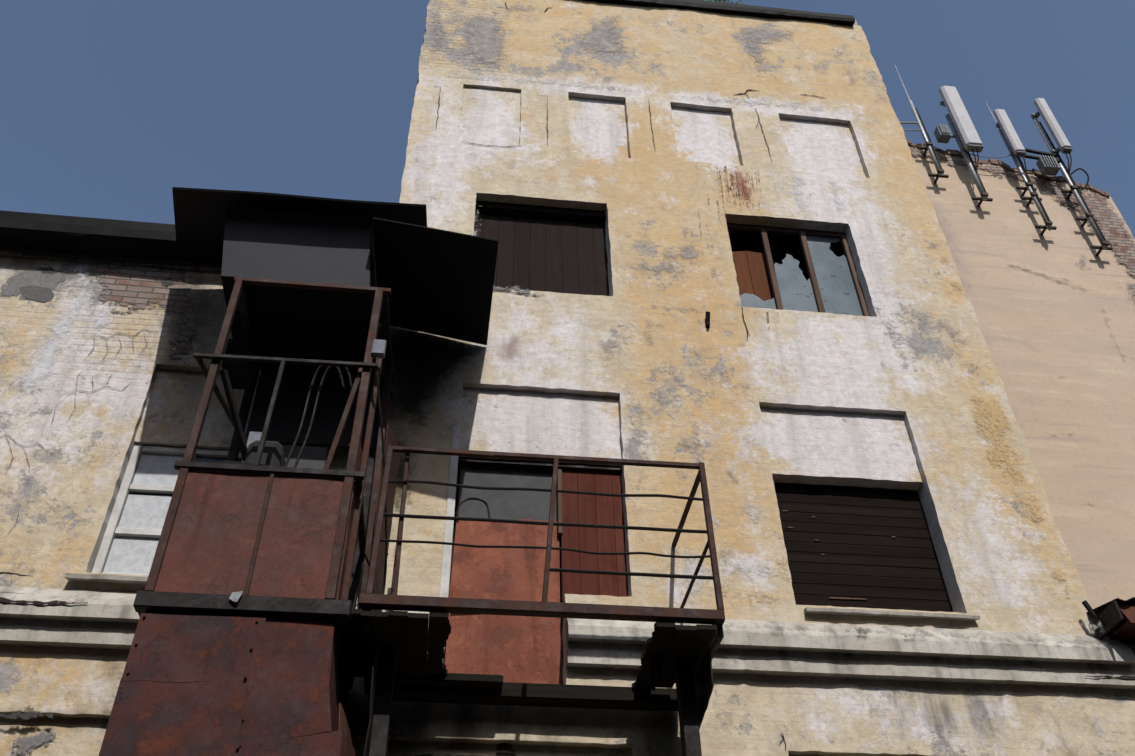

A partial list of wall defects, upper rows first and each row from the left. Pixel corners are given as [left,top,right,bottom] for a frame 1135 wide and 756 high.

peeling [459,5,535,80]
rust [708,166,761,207]
flaking render [909,147,1135,299]
flaking render [0,267,66,302]
flaking render [91,264,196,366]
crack [0,329,152,534]